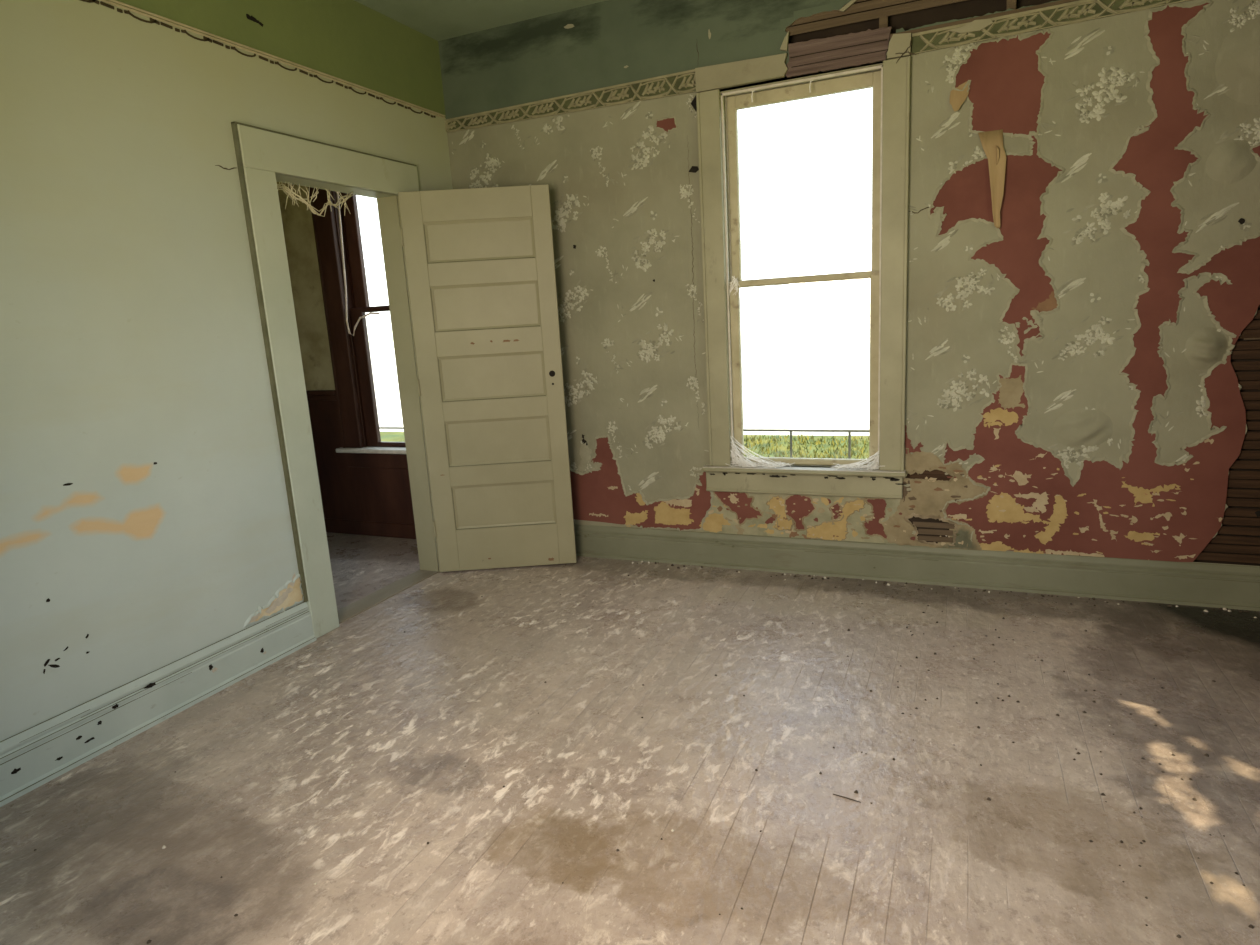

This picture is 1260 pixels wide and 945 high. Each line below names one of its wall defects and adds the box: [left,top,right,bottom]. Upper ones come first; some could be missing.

flaking render [570,0,1260,566]
peeling [0,499,170,562]
peeling [244,573,304,627]